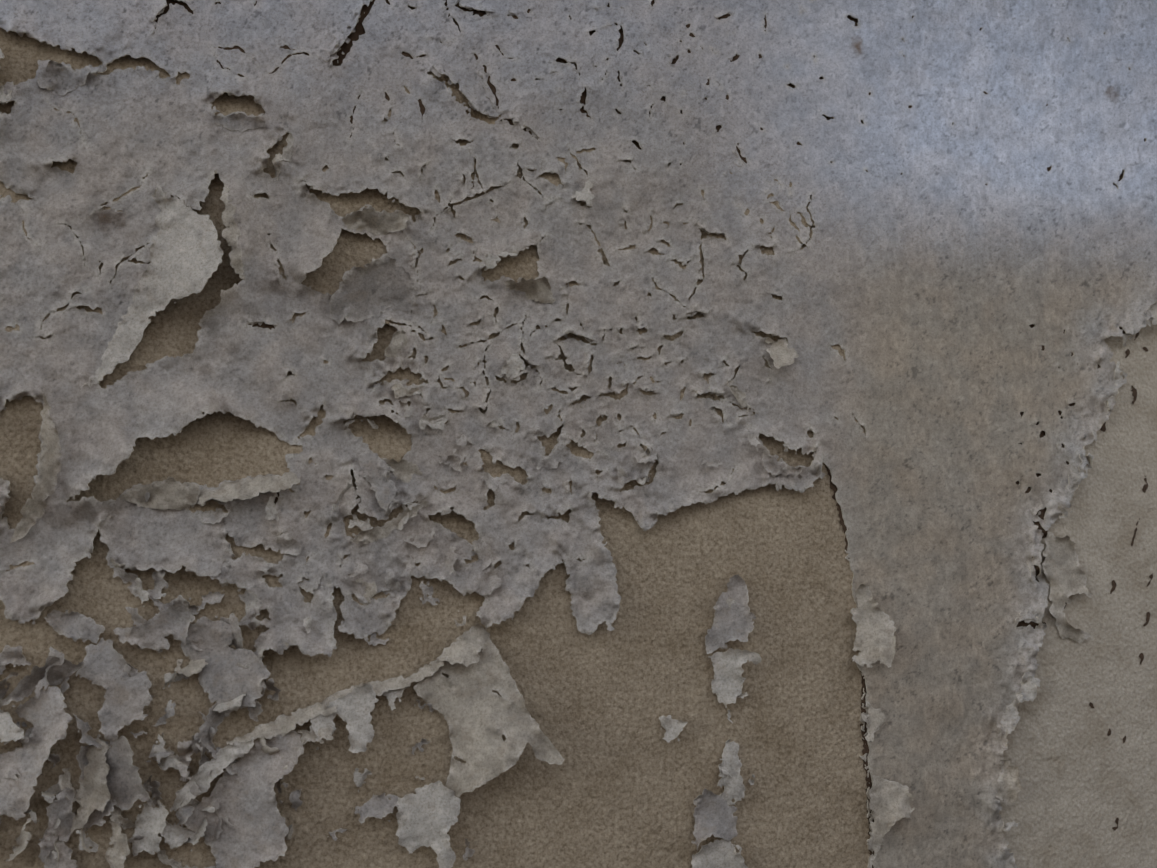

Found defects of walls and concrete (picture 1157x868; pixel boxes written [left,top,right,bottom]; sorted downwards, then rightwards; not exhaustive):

crack [150,0,194,29]
crack [323,0,375,66]
peeling [0,28,190,127]
peeling [209,92,265,132]
crack [384,52,541,140]
peeling [51,159,77,174]
peeling [263,132,294,181]
peeling [433,139,502,226]
peeling [512,144,596,210]
peeling [0,173,915,868]
peeling [995,301,1157,868]